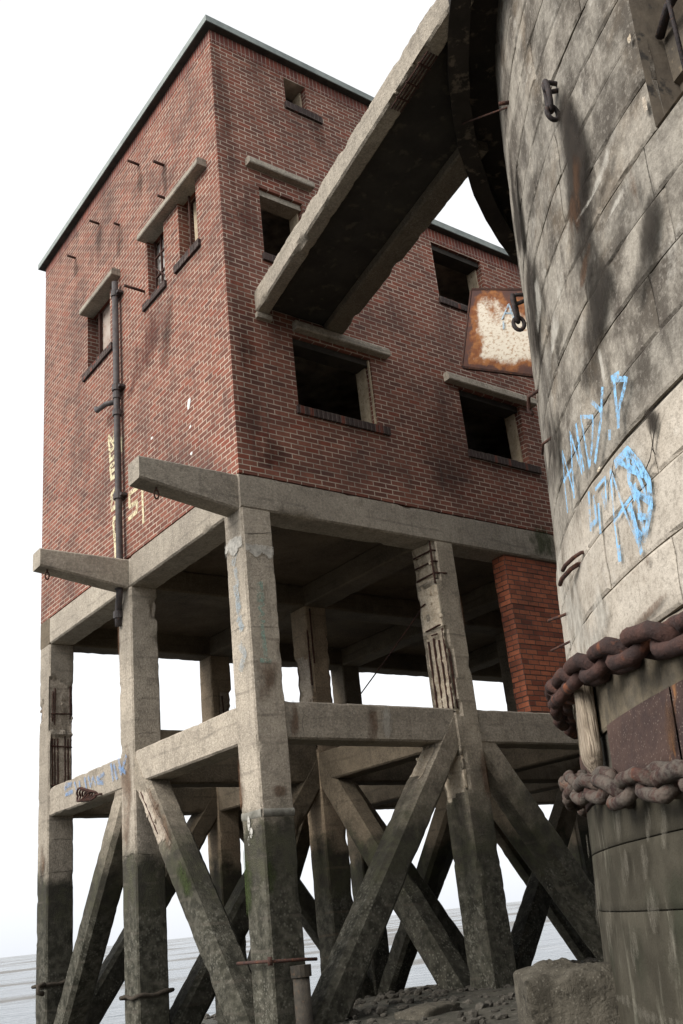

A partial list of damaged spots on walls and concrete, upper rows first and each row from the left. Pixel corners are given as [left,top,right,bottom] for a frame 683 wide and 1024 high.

leakage [510,162,541,360]
leakage [559,93,610,385]
leakage [633,191,658,300]
peeling [225,535,274,559]
spalling [413,540,459,713]
spalling [40,676,73,788]
spalling [139,789,171,846]
spalling [445,755,468,803]